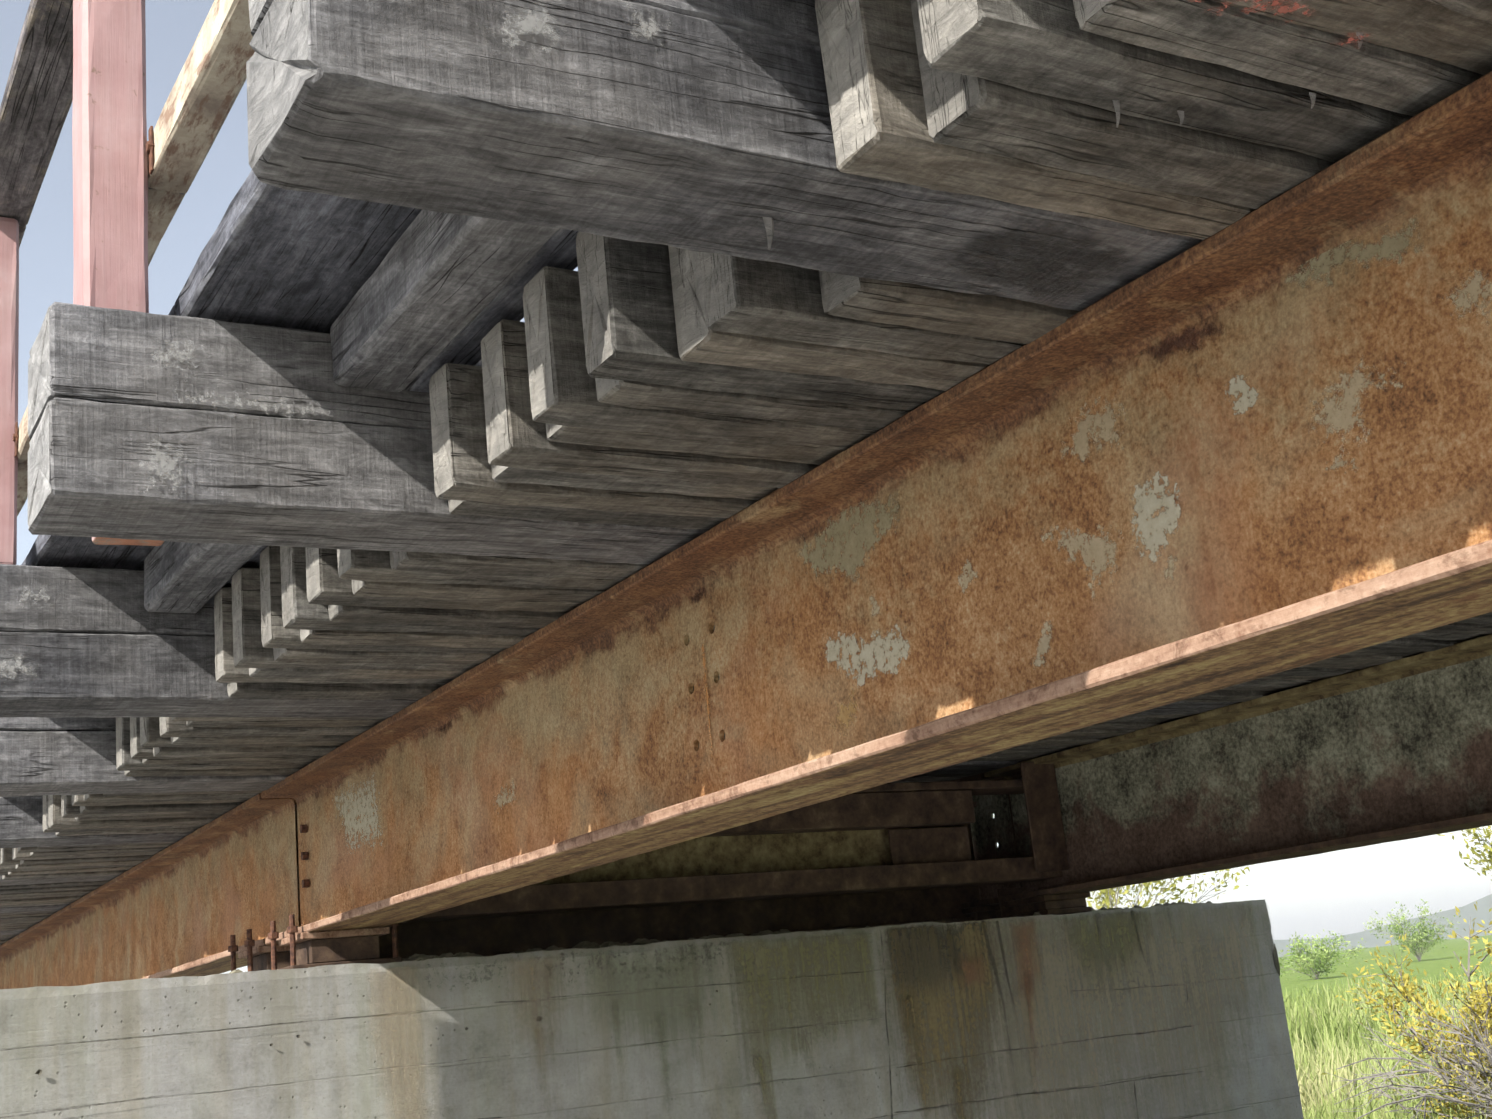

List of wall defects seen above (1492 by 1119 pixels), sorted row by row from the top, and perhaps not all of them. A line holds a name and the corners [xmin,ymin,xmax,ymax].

peeling [1448,270,1492,317]
corrosion [1141,323,1222,359]
peeling [1062,397,1126,461]
peeling [1225,375,1259,415]
peeling [1313,363,1402,470]
peeling [801,497,900,581]
peeling [1041,471,1181,597]
peeling [826,597,910,735]